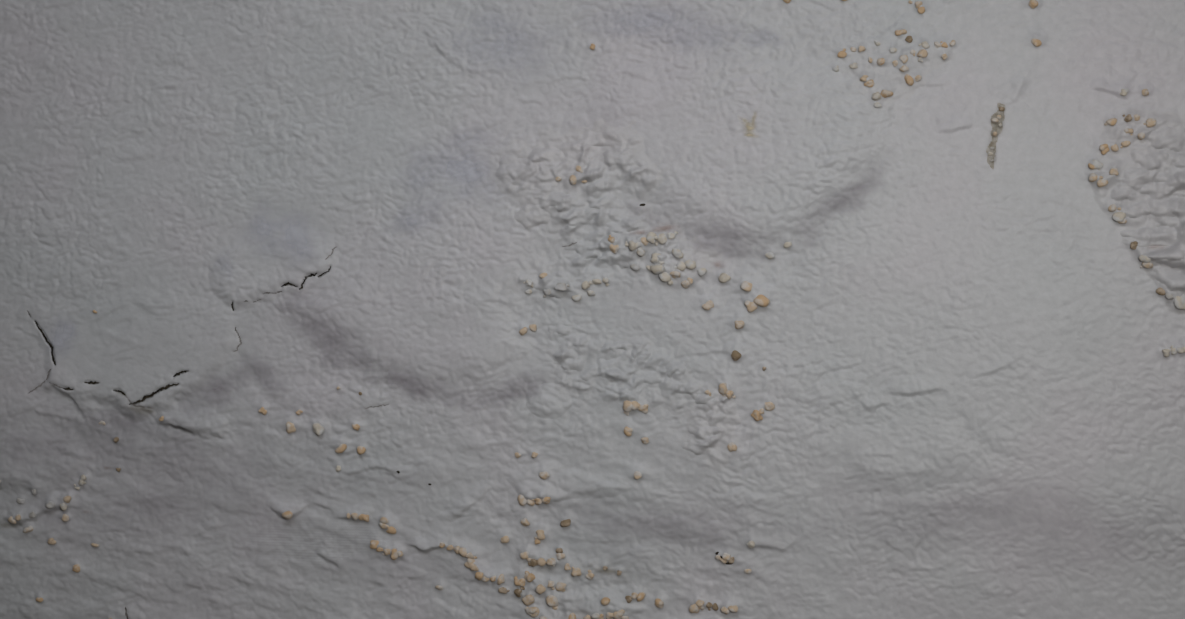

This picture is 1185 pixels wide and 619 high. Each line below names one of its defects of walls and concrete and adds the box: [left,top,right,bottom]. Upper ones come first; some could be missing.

crack [231,247,336,352]
crack [27,310,187,408]